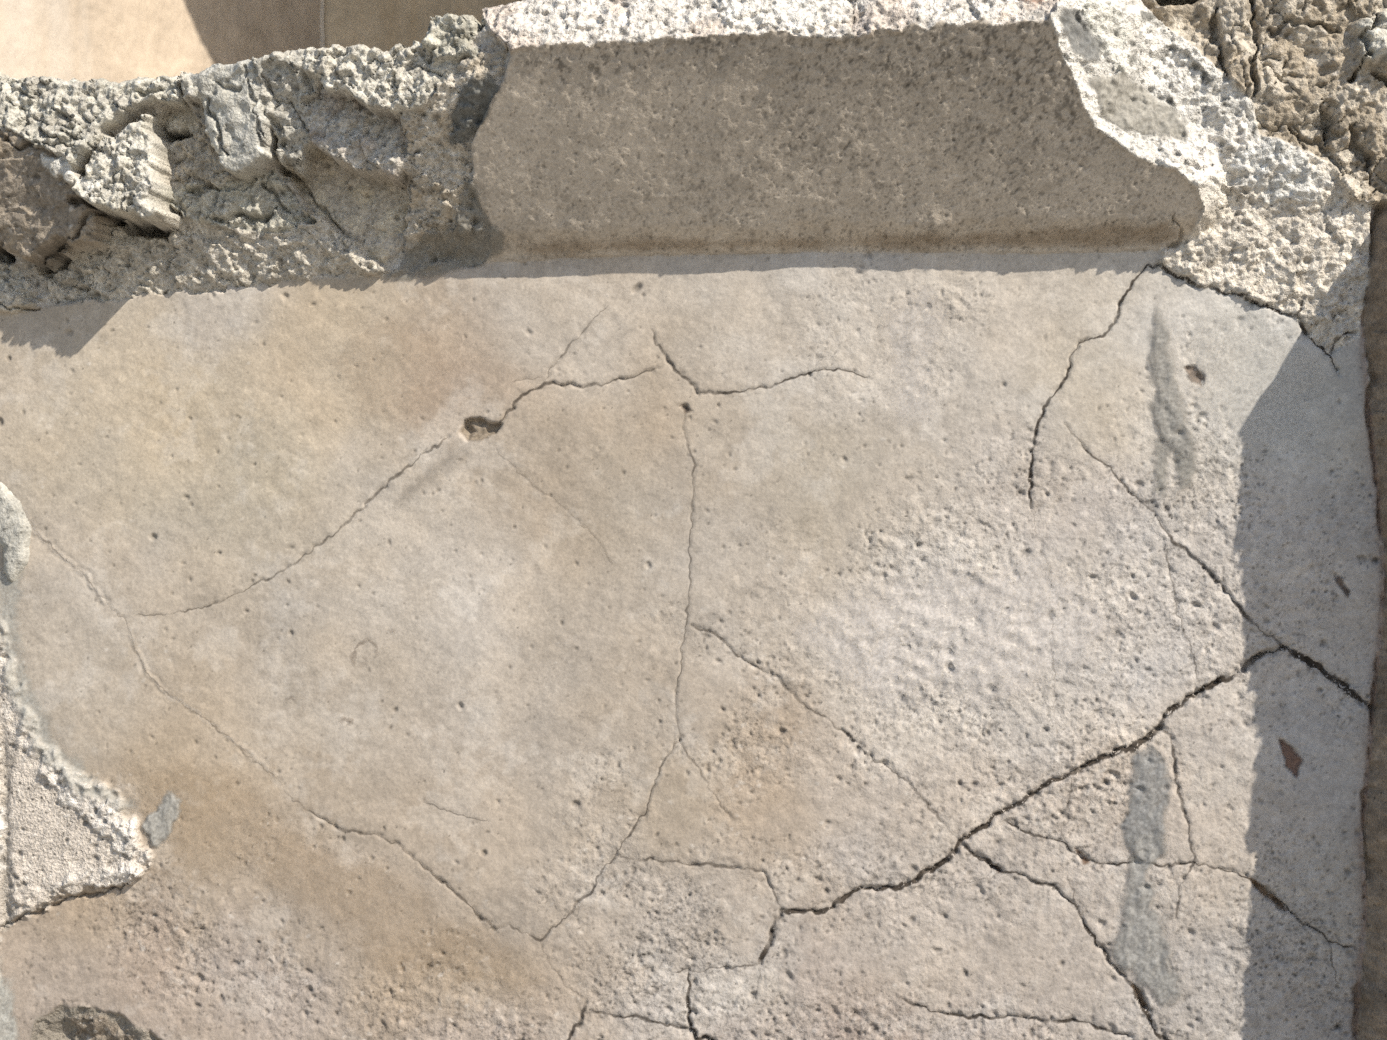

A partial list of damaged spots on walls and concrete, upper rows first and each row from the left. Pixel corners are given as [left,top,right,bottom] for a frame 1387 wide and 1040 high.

flaking render [482,0,1374,356]
crack [500,382,561,422]
crack [721,368,865,394]
crack [1028,264,1350,502]
flaking render [0,604,154,950]
crack [734,445,1366,1040]
spalling [31,1005,160,1040]
crack [568,974,713,1040]